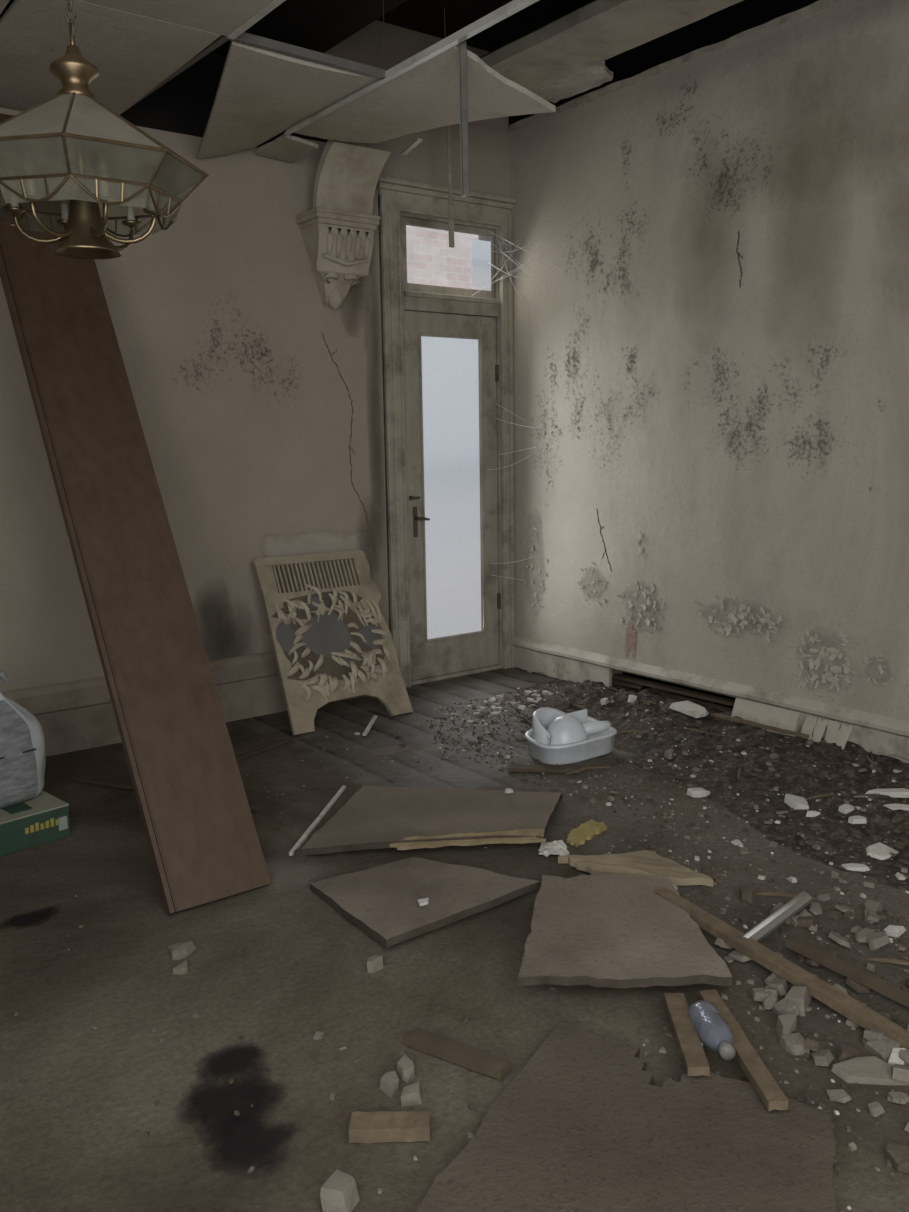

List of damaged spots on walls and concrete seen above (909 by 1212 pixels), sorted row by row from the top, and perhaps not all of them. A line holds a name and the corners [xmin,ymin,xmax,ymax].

crack [735,230,743,287]
crack [321,332,368,523]
crack [596,508,612,572]
peeling [577,562,664,637]
peeling [694,596,782,643]
peeling [789,629,855,698]